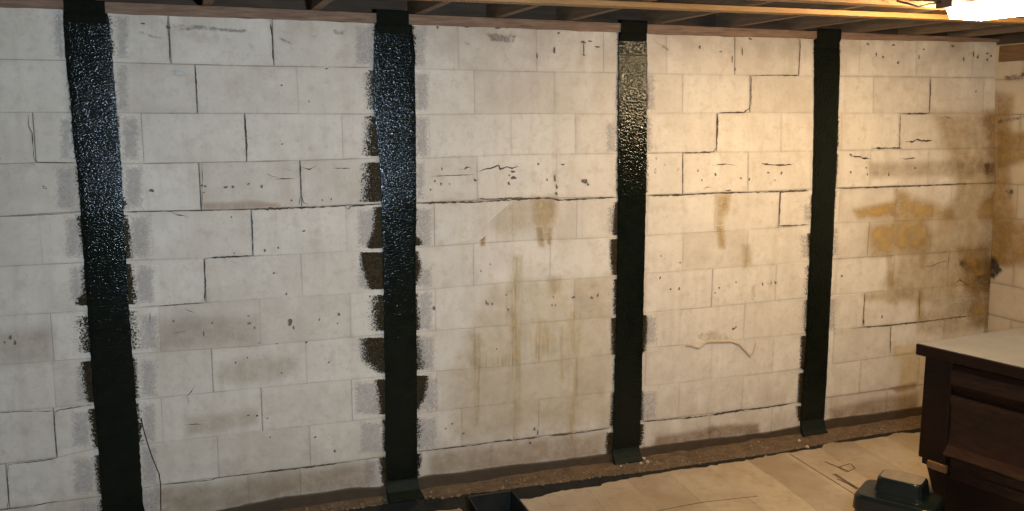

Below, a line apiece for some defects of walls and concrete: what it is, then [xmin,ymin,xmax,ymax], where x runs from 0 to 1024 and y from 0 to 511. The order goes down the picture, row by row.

crack [651,43,808,226]
crack [850,80,951,160]
crack [422,165,614,204]
leakage [960,258,1001,283]